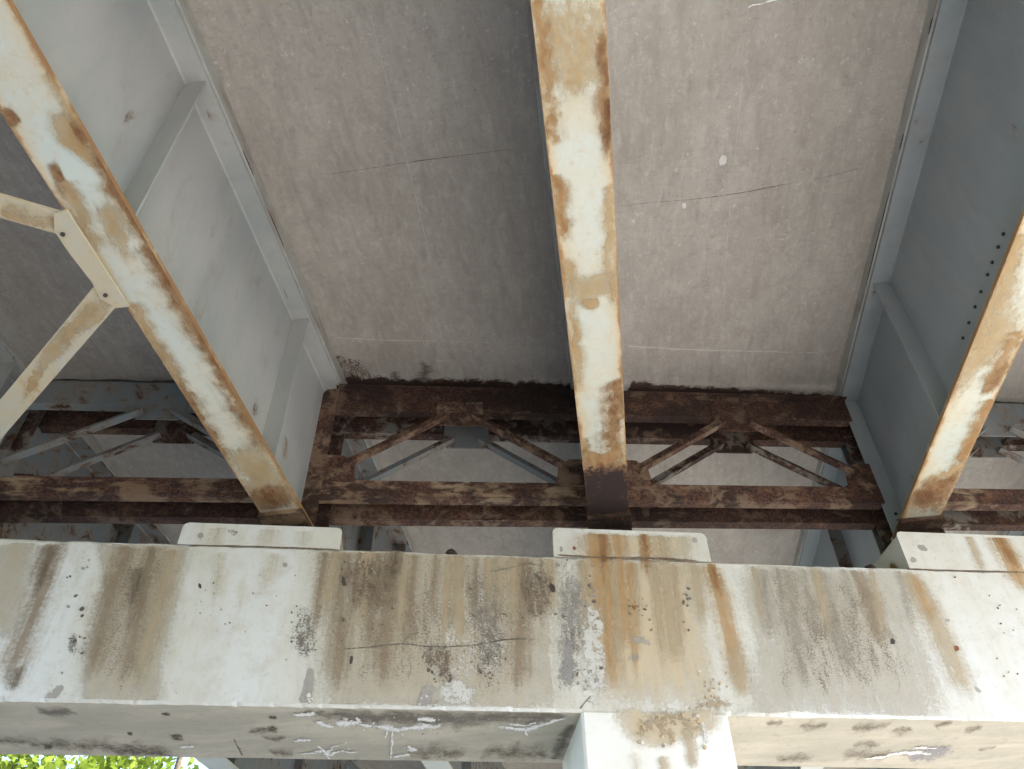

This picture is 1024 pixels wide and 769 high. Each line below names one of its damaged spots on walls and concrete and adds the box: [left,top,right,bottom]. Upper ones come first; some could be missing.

corrosion [532,0,612,154]
corrosion [47,73,291,509]
corrosion [565,186,617,383]
corrosion [581,379,629,516]
crack [628,57,815,353]
corrosion [912,234,1024,512]
water stain [0,543,63,689]
water stain [83,544,186,700]
water stain [293,551,574,759]
crack [347,632,533,663]
corrosion [578,534,748,766]
water stain [745,566,936,732]